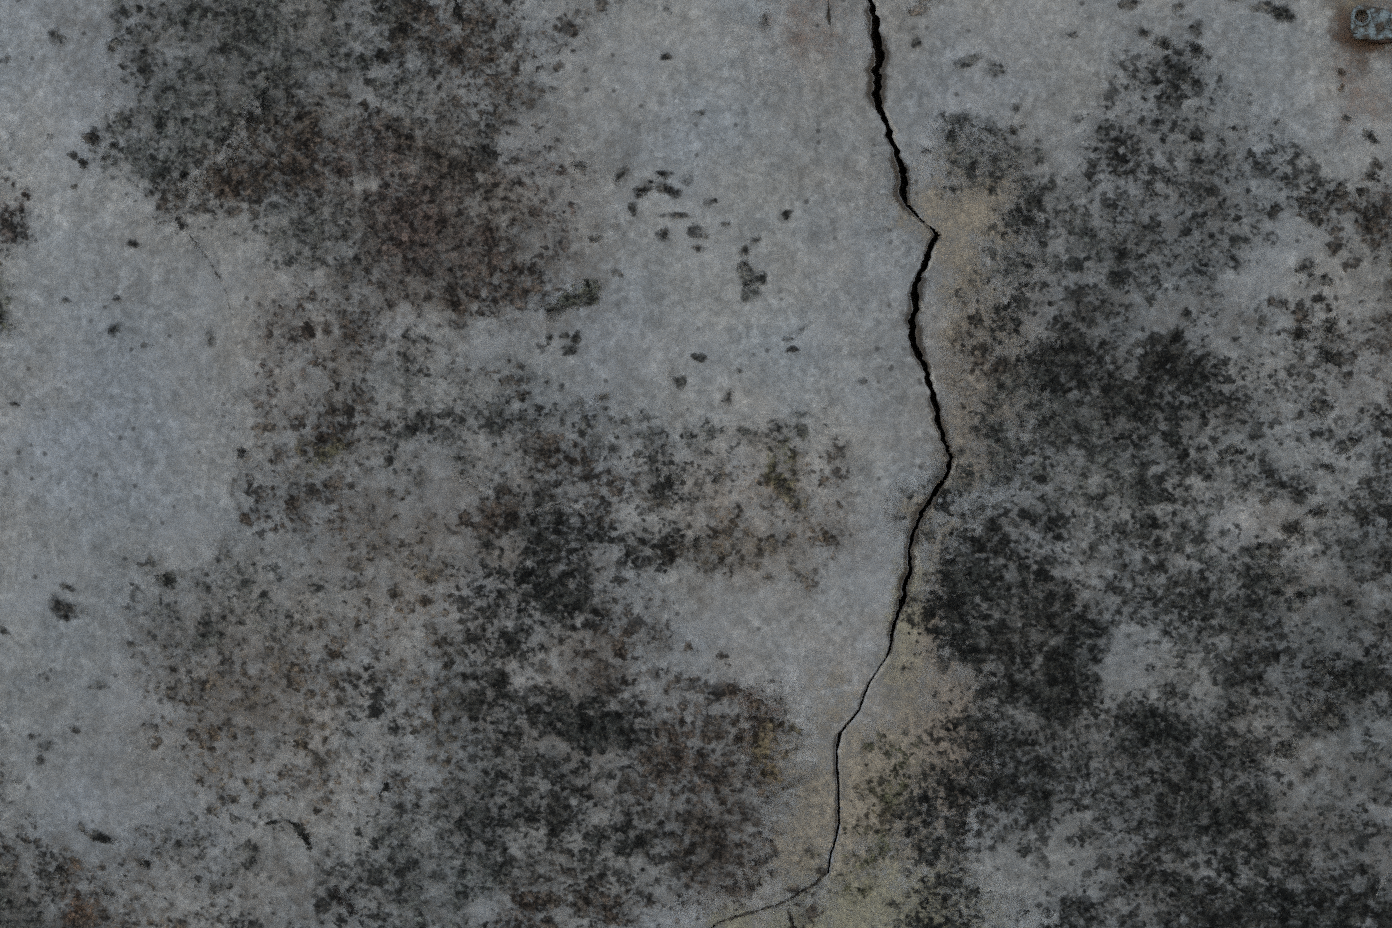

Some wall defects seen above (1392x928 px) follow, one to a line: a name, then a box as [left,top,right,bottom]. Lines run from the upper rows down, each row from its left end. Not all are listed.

mould [1238,0,1295,22]
rust [1333,0,1384,107]
mould [66,126,99,169]
mould [0,176,37,264]
mould [616,167,730,252]
water stain [1295,258,1333,288]
water stain [690,353,707,362]
water stain [674,375,687,390]
crack [711,0,957,928]
mould [137,555,211,600]
mould [50,583,88,622]
mould [0,812,273,928]